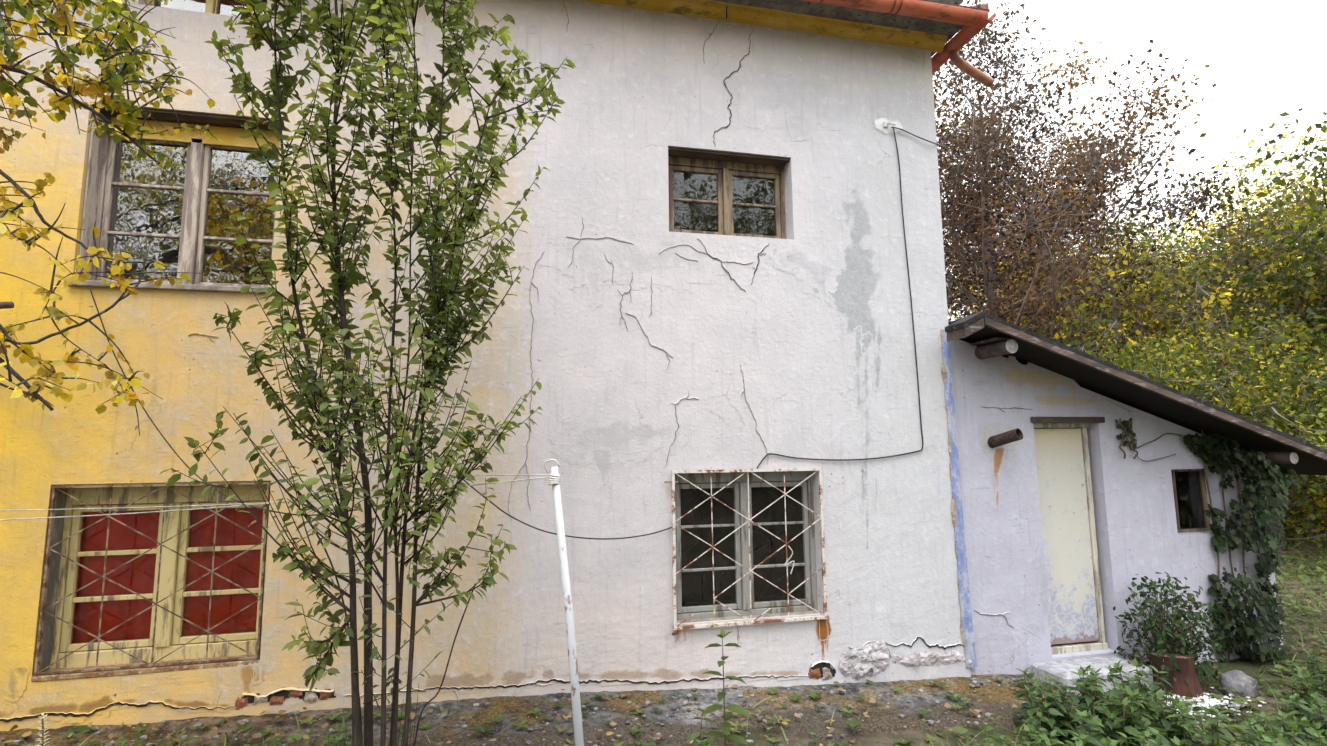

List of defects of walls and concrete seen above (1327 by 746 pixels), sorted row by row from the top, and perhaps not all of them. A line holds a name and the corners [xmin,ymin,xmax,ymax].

crack [702,4,754,146]
crack [508,217,769,522]
damp [771,176,887,551]
spalling [808,402,972,680]
corrosion [992,446,1011,515]
crack [0,698,235,723]
spalling [235,687,336,710]
corrosion [814,613,833,661]